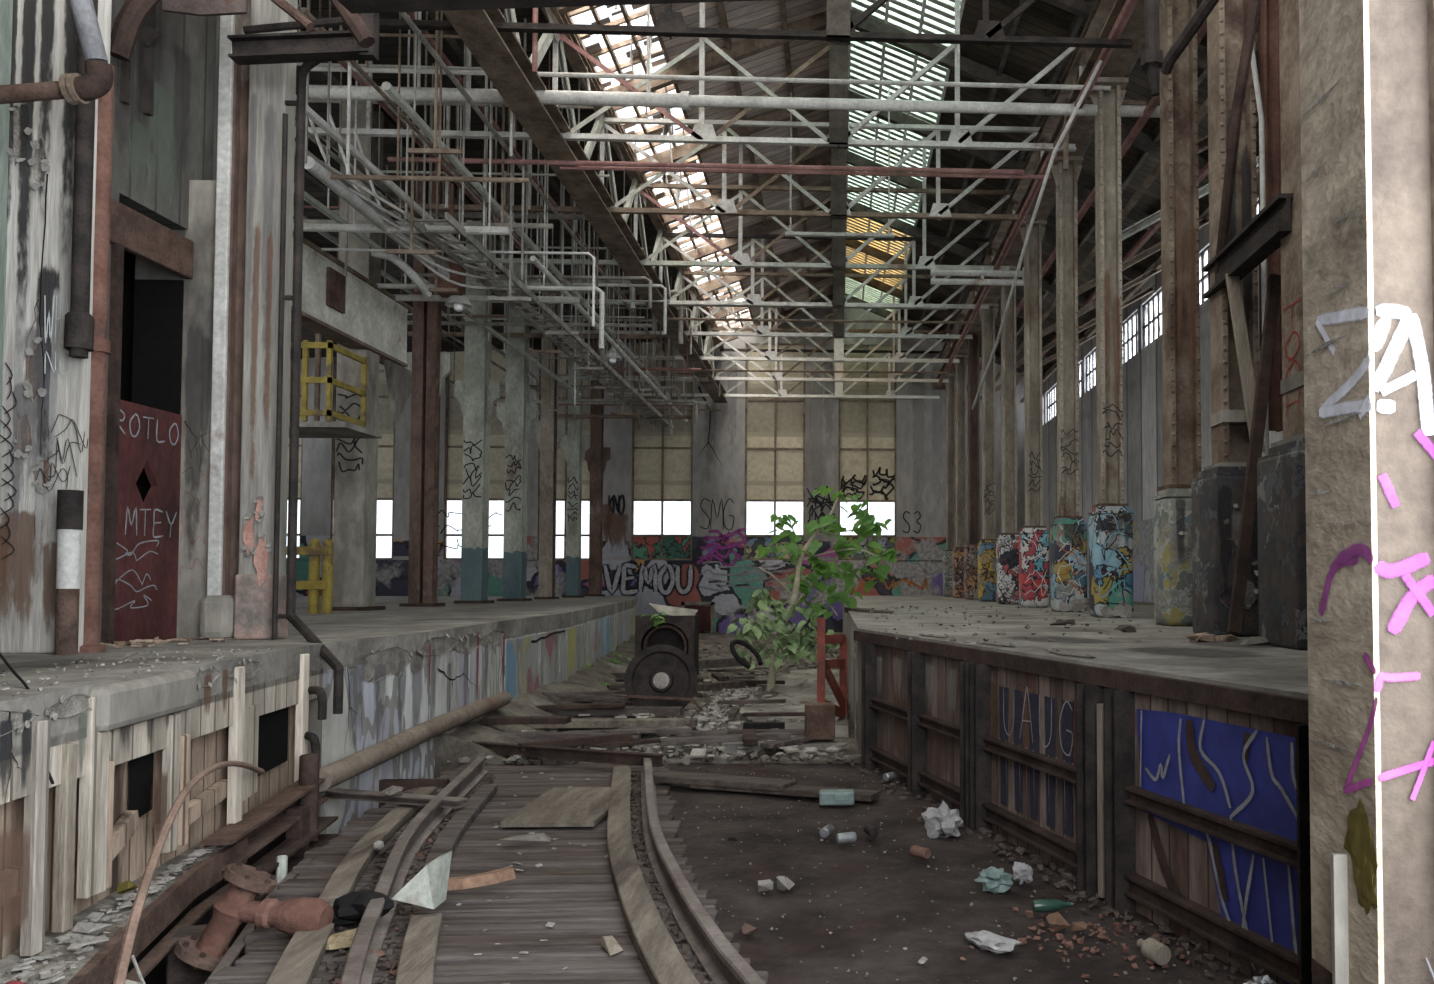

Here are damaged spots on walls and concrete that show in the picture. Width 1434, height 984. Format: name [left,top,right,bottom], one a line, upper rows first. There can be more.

water stain [11,0,78,84]
water stain [7,99,76,474]
water stain [0,710,32,796]